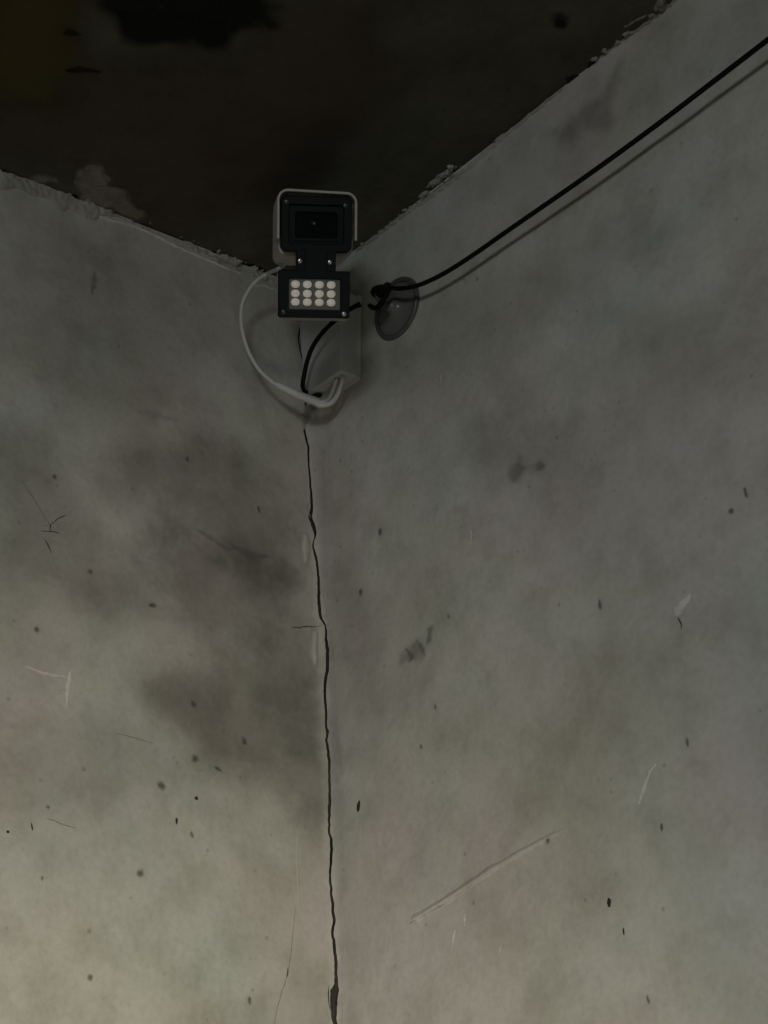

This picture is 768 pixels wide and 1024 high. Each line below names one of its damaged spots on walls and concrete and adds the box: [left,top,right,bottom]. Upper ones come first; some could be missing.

water stain [101,0,272,48]
spalling [0,173,277,291]
crack [292,402,339,1024]